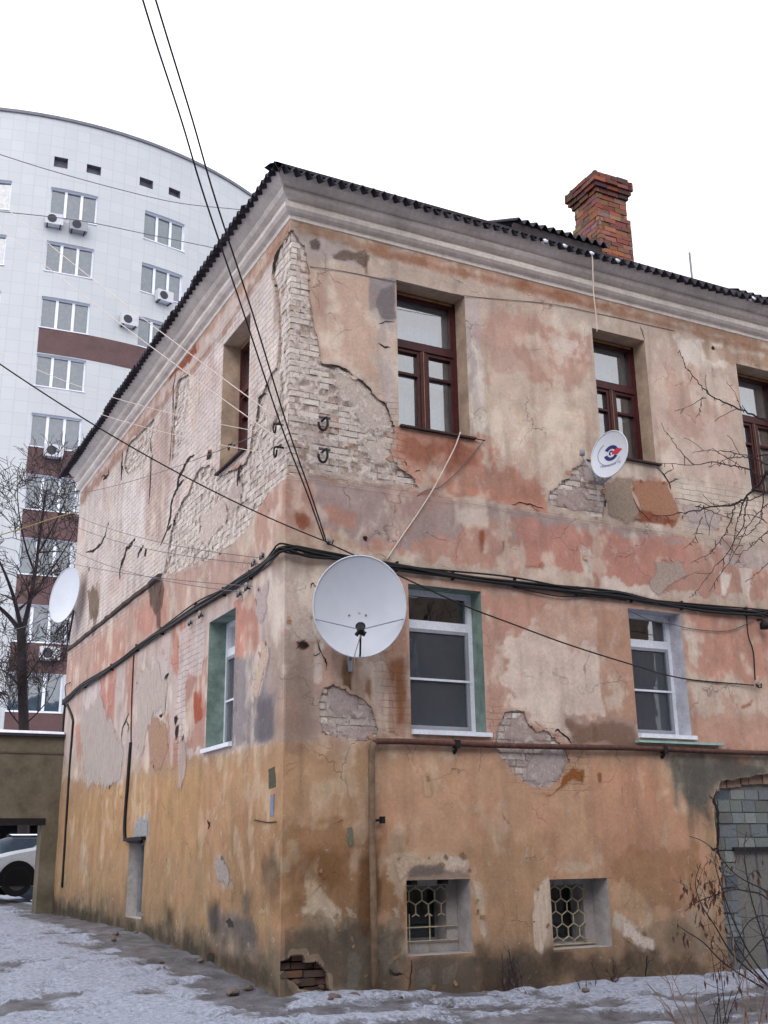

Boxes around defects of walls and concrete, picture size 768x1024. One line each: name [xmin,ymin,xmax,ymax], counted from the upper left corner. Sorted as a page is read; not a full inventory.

flaking render [165,231,416,575]
crack [86,374,194,578]
flaking render [548,461,722,530]
peeling [80,692,123,790]
peeling [136,661,186,789]
flaking render [319,684,377,741]
flaking render [495,710,569,788]
leakage [52,901,170,940]
leakage [183,938,269,984]
flaking render [279,955,329,991]